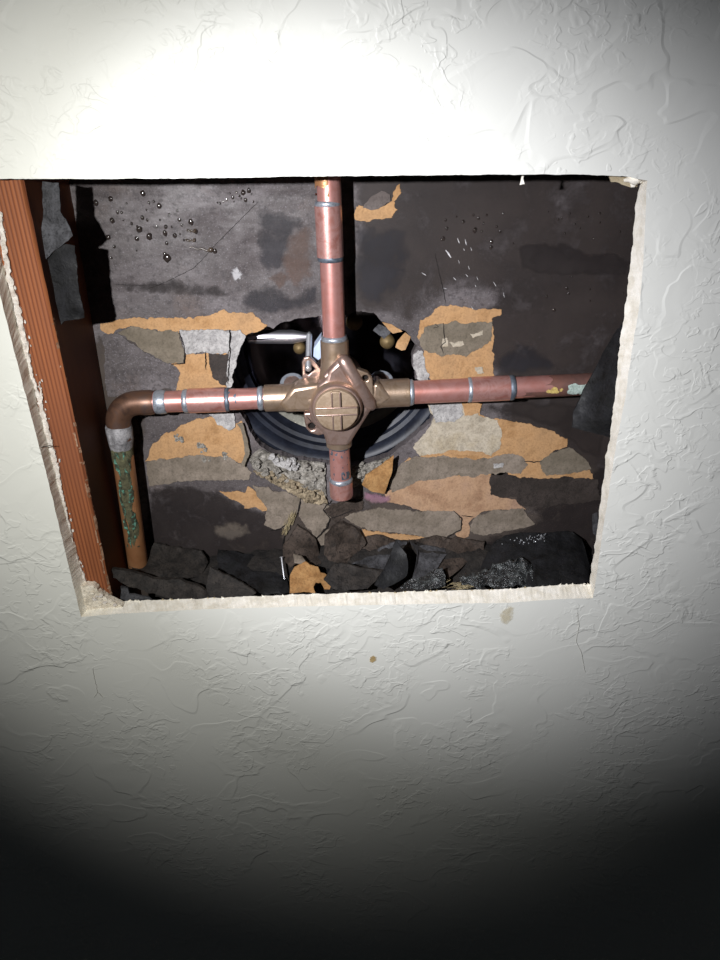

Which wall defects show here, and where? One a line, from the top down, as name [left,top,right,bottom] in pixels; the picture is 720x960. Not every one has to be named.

water stain [347,174,640,377]
spalling [250,449,328,505]
spalling [351,456,390,488]
peeling [290,554,331,593]